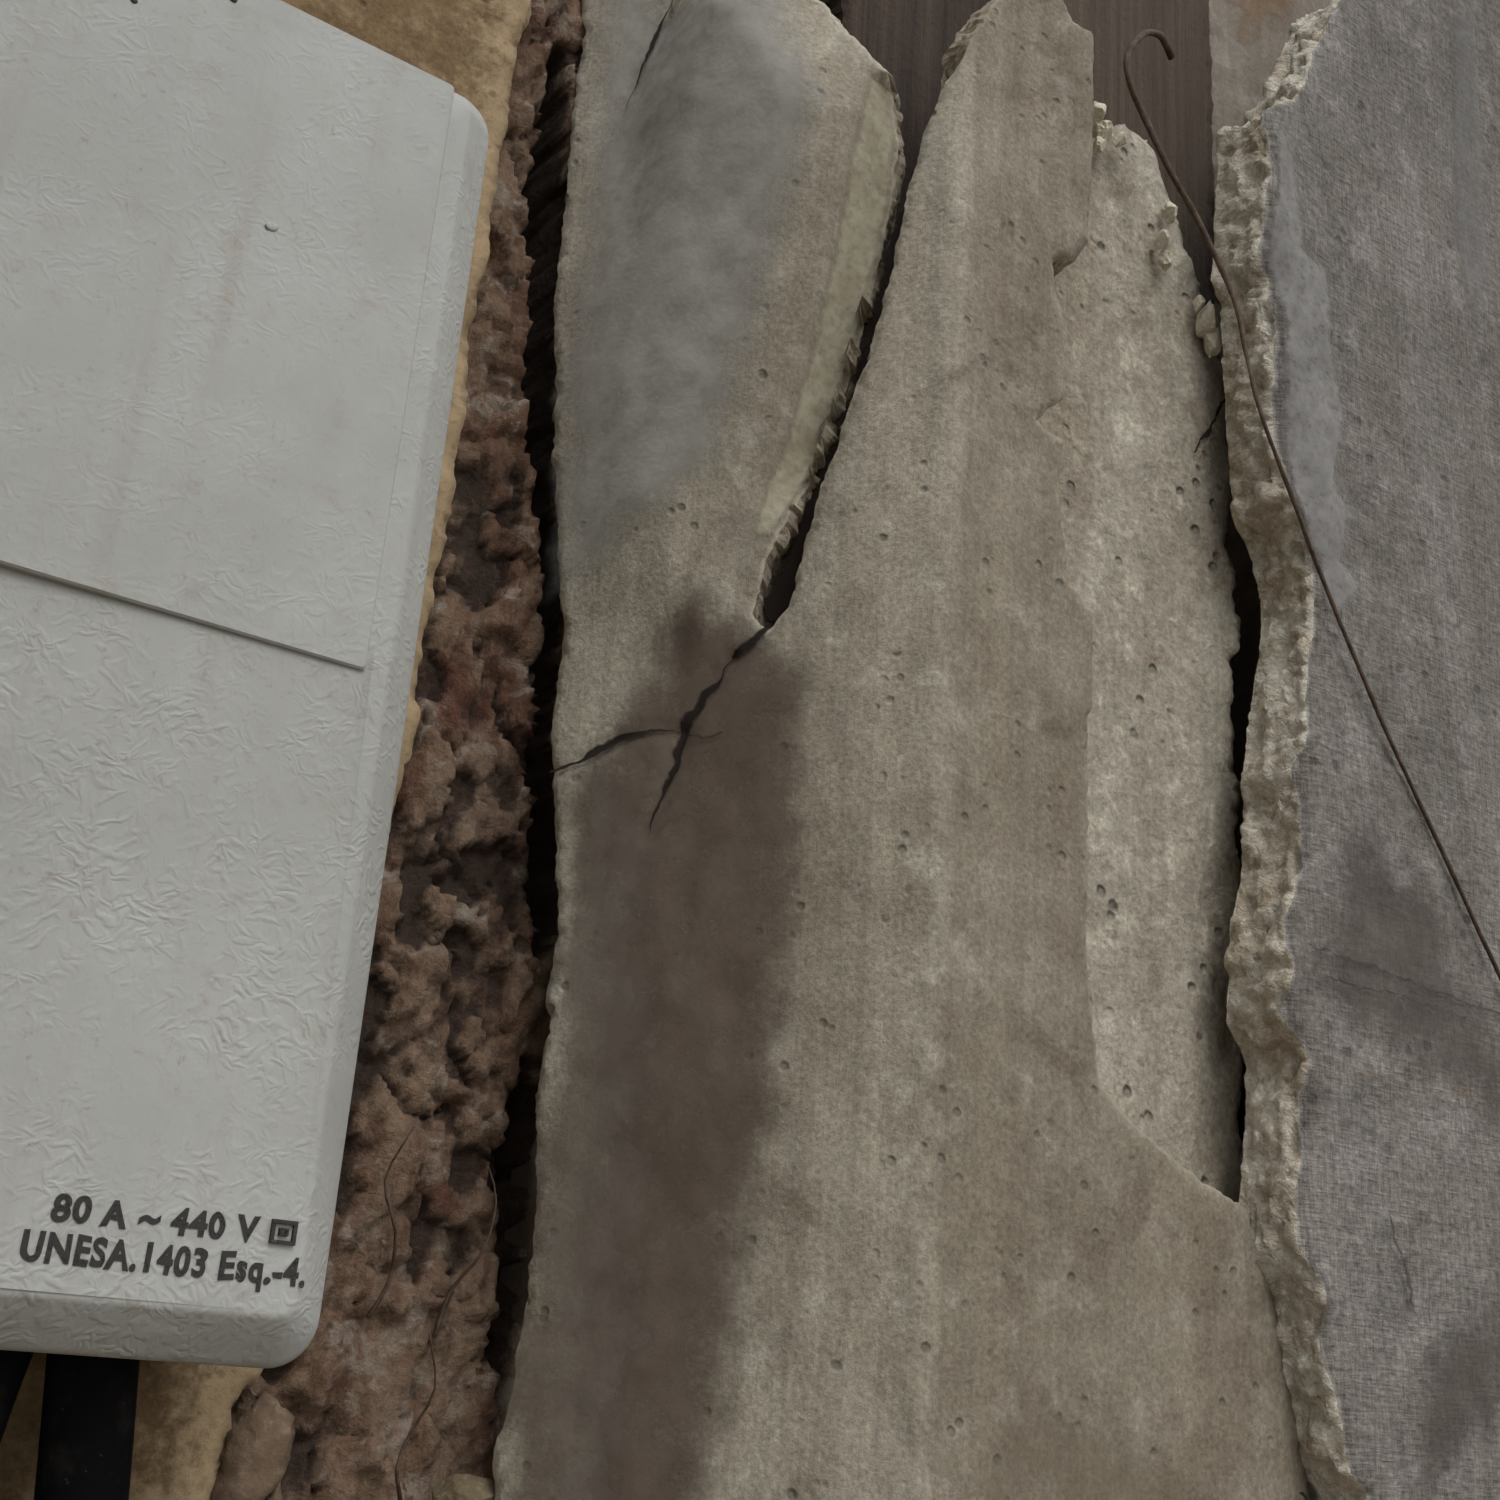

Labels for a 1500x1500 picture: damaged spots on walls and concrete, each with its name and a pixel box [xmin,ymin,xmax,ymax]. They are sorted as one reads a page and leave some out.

crack [550,210,905,835]
spalling [1037,101,1244,1203]
peeling [1269,137,1356,609]